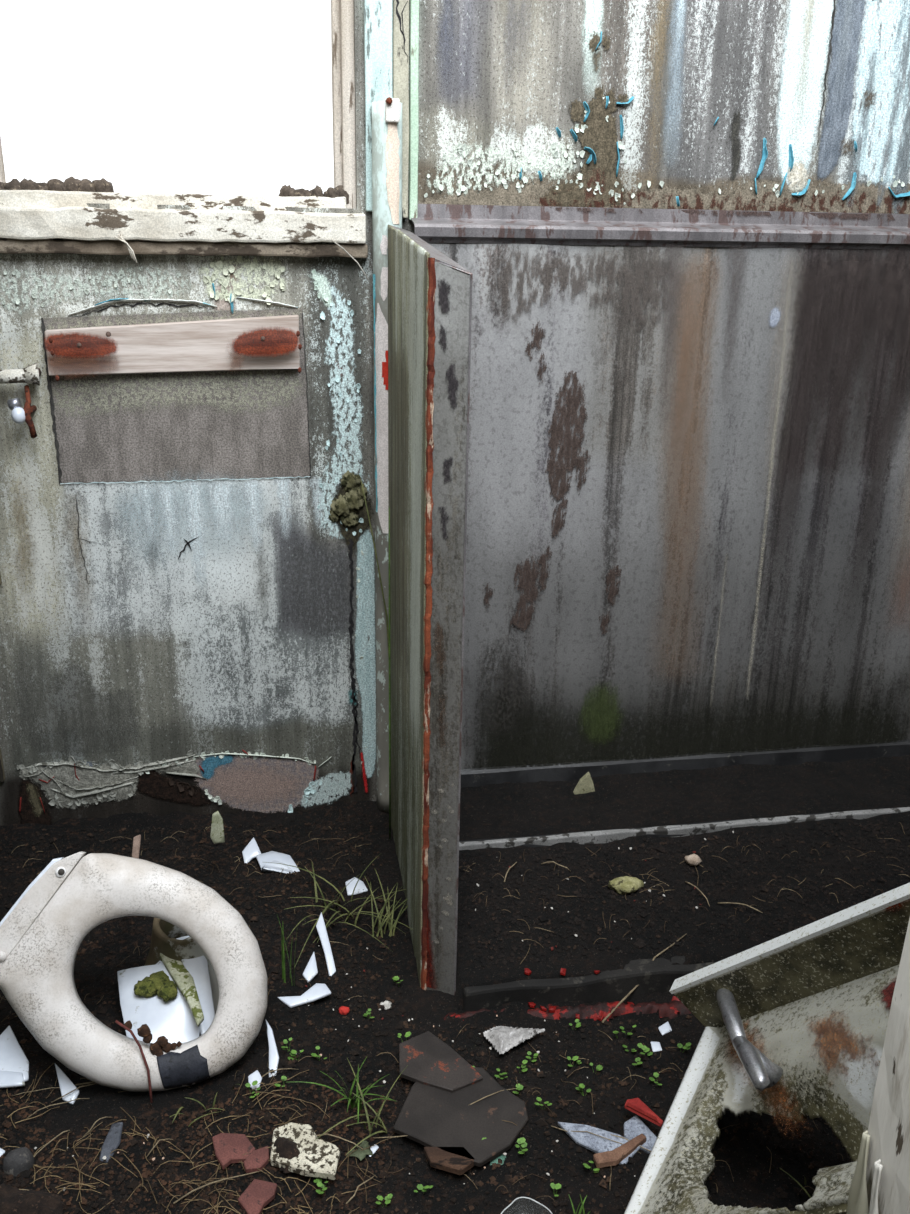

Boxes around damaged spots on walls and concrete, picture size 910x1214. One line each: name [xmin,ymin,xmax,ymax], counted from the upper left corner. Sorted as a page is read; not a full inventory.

spalling [418,0,910,214]
corrosion [495,250,674,341]
corrosion [525,322,549,384]
leakage [767,249,910,525]
leakage [131,482,261,564]
spalling [0,122,400,825]
leakage [277,479,289,523]
corrosion [510,371,591,631]
corrosion [599,565,622,634]